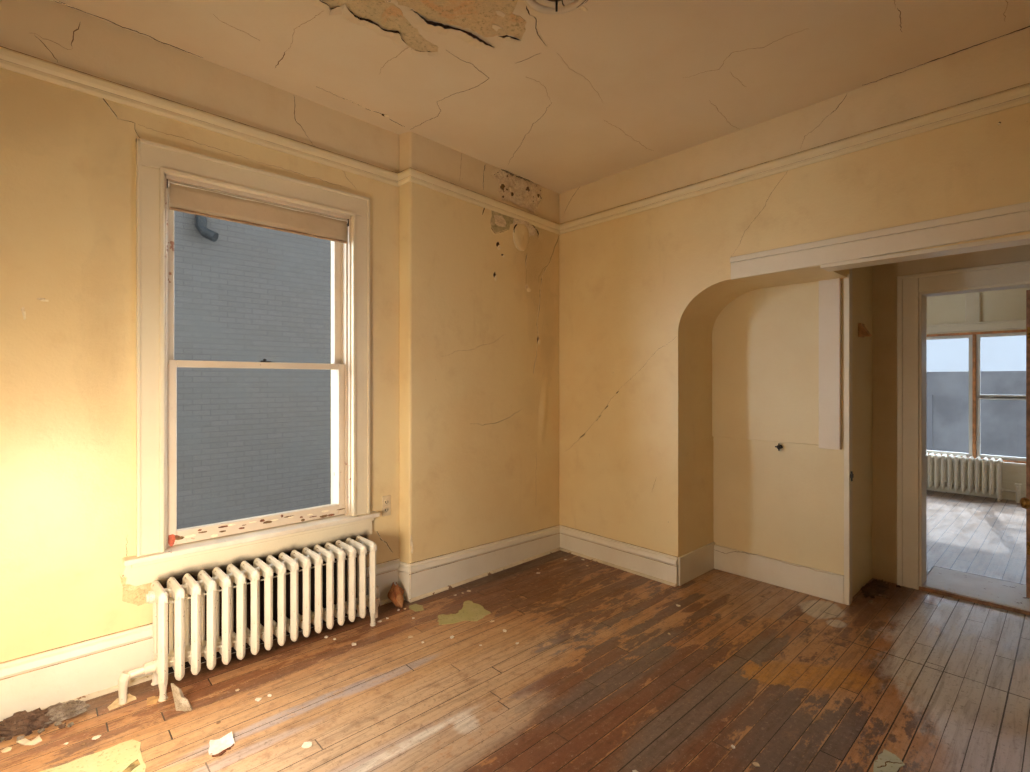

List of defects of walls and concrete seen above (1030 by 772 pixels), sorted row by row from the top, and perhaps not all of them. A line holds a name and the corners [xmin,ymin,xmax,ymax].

crack [34,0,203,62]
crack [99,97,355,188]
crack [318,52,489,130]
flaking render [308,0,527,56]
crack [459,6,654,215]
crack [800,1,1030,149]
spalling [489,168,543,257]
spalling [120,576,152,606]